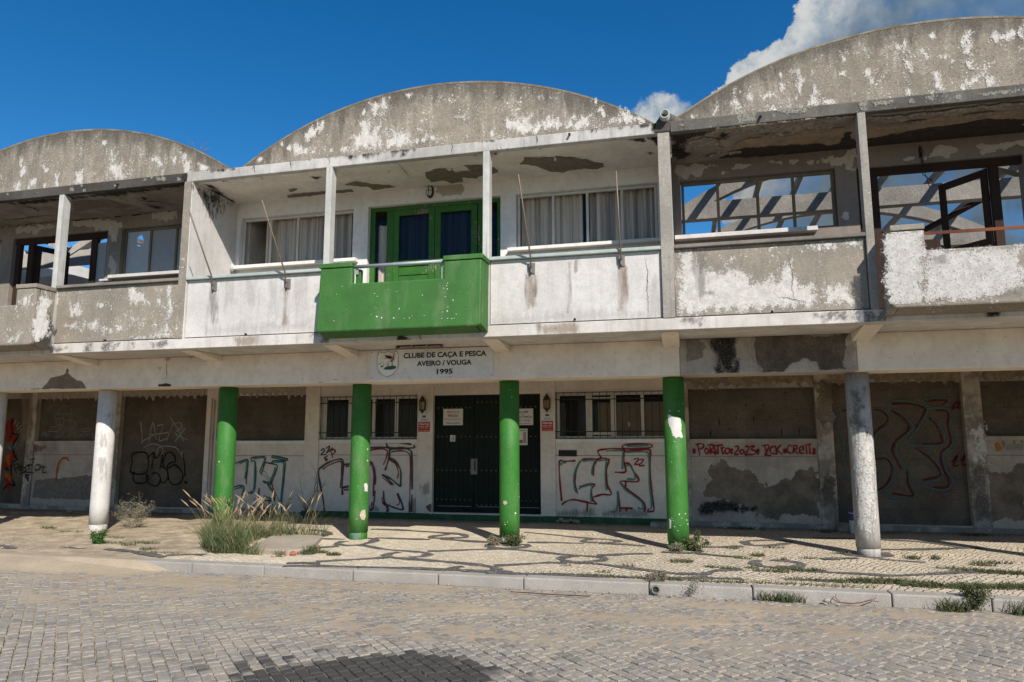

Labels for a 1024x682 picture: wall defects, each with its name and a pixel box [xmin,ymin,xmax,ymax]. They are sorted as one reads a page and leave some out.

peeling [674,67,1024,180]
leakage [10,168,235,217]
peeling [287,181,395,198]
peeling [425,165,498,196]
peeling [520,156,604,173]
peeling [806,238,865,253]
peeling [674,249,863,316]
peeling [881,230,1024,304]
leakage [710,338,739,373]
flaking render [748,334,856,372]
peeling [668,414,683,442]
peeling [703,457,821,520]